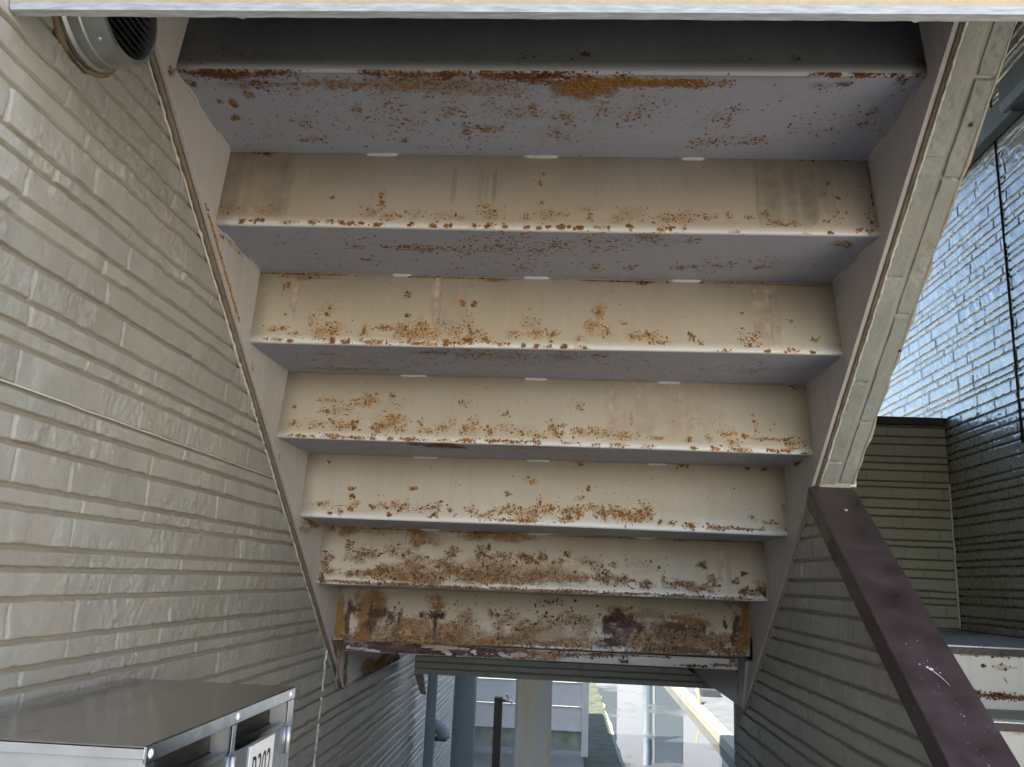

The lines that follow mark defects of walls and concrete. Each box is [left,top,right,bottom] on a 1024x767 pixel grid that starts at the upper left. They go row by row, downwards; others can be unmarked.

rust [168,47,926,160]
rust [820,161,877,249]
rust [205,191,824,380]
rust [288,392,667,466]
rust [672,411,811,471]
rust [302,476,787,687]
peeling [398,645,527,658]
rust [975,689,1024,702]